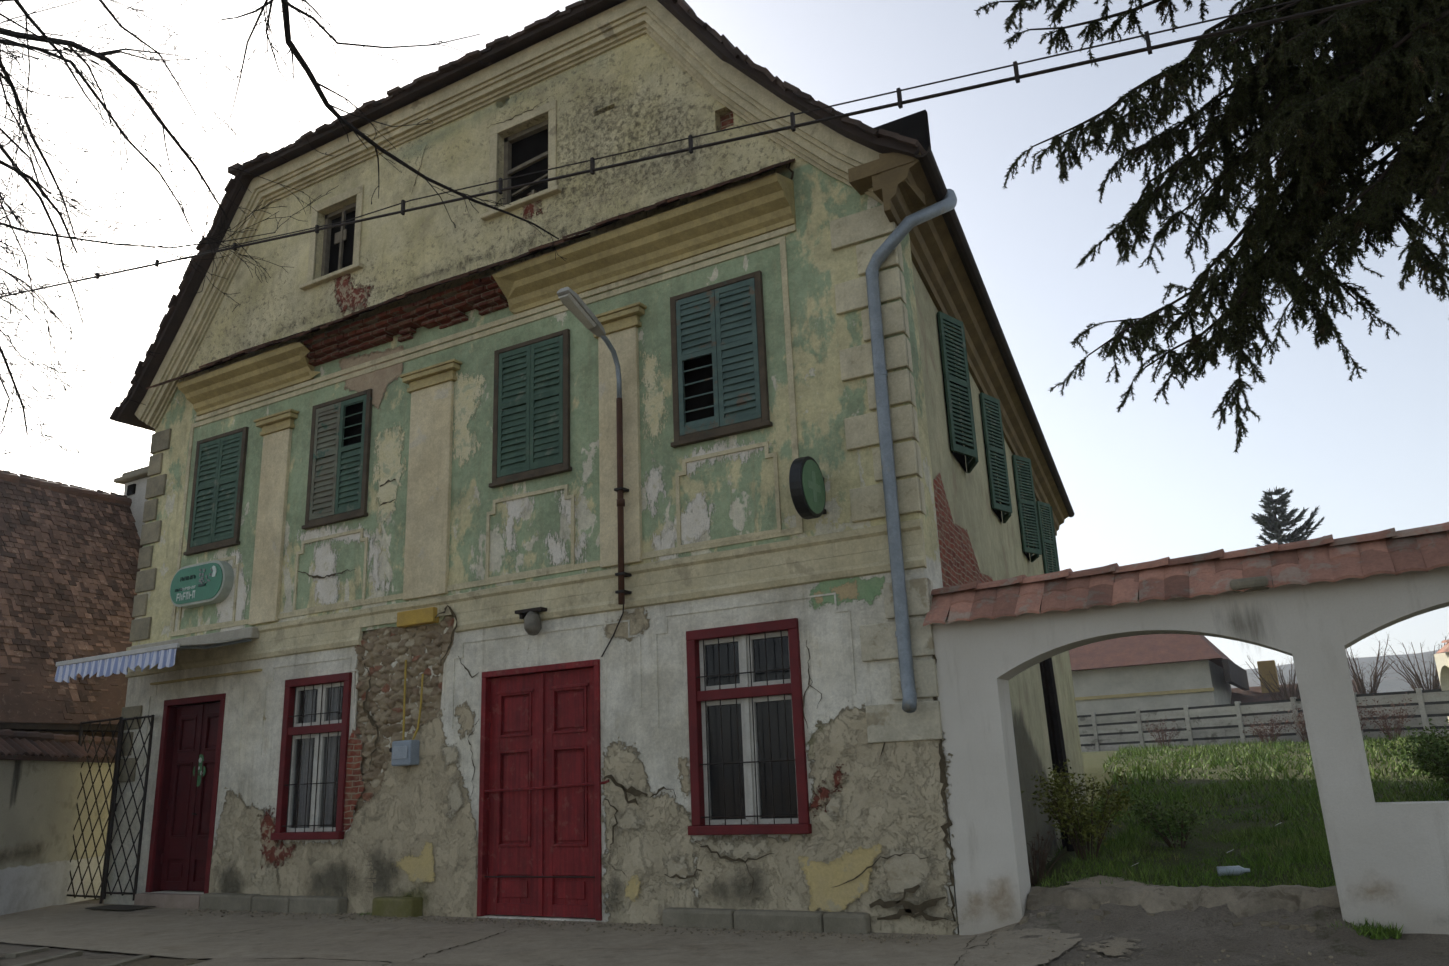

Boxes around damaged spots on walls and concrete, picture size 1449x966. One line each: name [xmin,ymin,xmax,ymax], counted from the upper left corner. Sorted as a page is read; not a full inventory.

peeling [297,421,406,612]
peeling [502,491,540,552]
peeling [542,485,588,573]
peeling [639,351,715,561]
peeling [683,440,773,477]
peeling [208,700,478,918]
crack [604,774,676,876]
crack [664,841,773,895]
peeling [601,703,959,935]
crack [831,739,956,922]